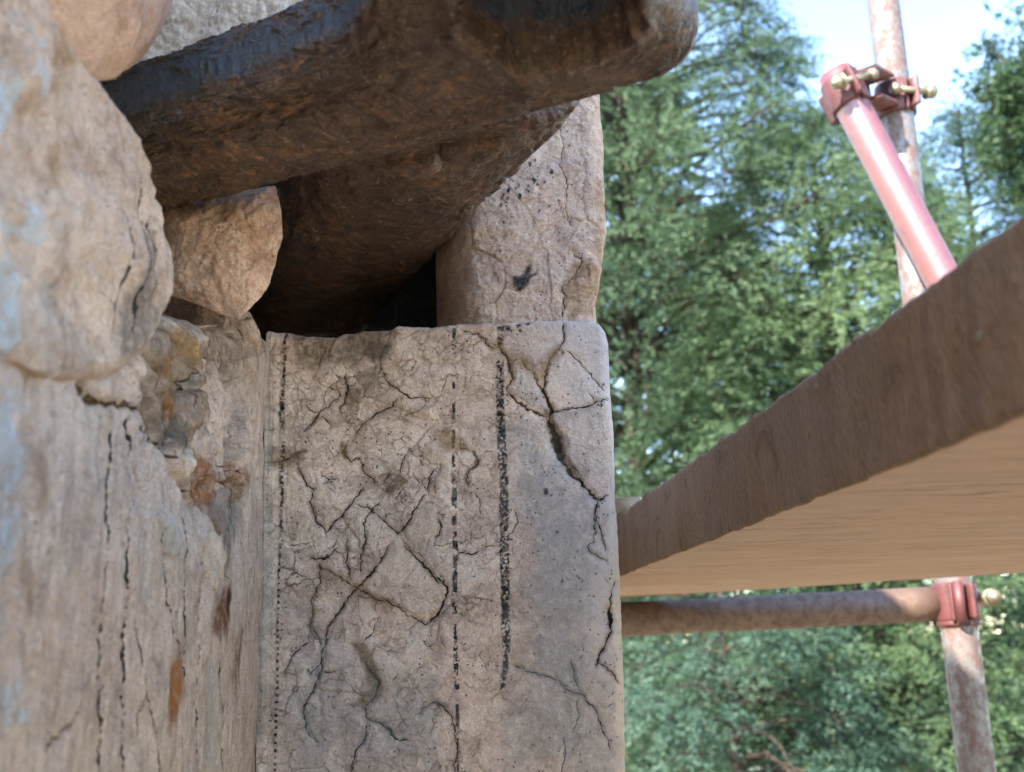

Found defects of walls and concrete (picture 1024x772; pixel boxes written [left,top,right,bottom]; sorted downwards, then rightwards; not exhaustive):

crack [553,129,581,225]
crack [46,363,522,772]
crack [464,254,620,772]